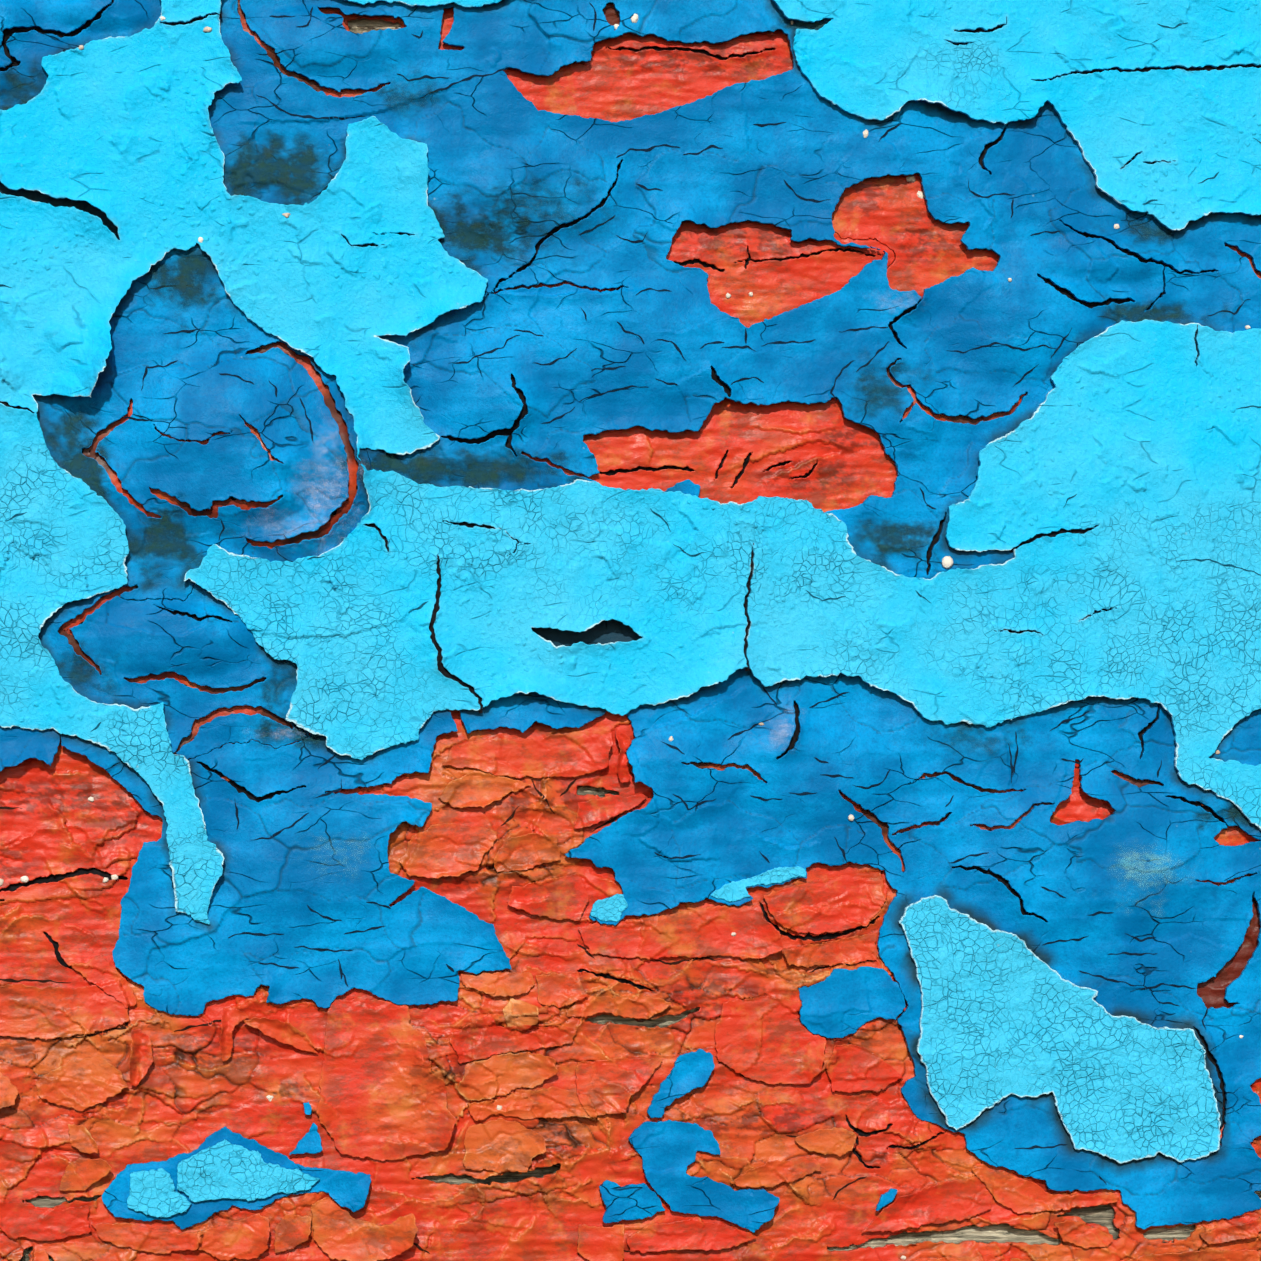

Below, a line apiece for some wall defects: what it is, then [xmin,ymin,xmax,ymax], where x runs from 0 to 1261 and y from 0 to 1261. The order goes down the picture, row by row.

peeling [0,0,161,110]
crack [1035,64,1261,81]
peeling [33,0,1261,766]
crack [442,521,528,556]
crack [408,556,483,713]
peeling [438,727,647,829]
crack [654,551,1228,1140]
spalling [1050,759,1115,825]
spalling [1214,817,1260,846]
spalling [1197,892,1261,1009]
peeling [0,823,906,1261]
peeling [827,1166,1120,1251]